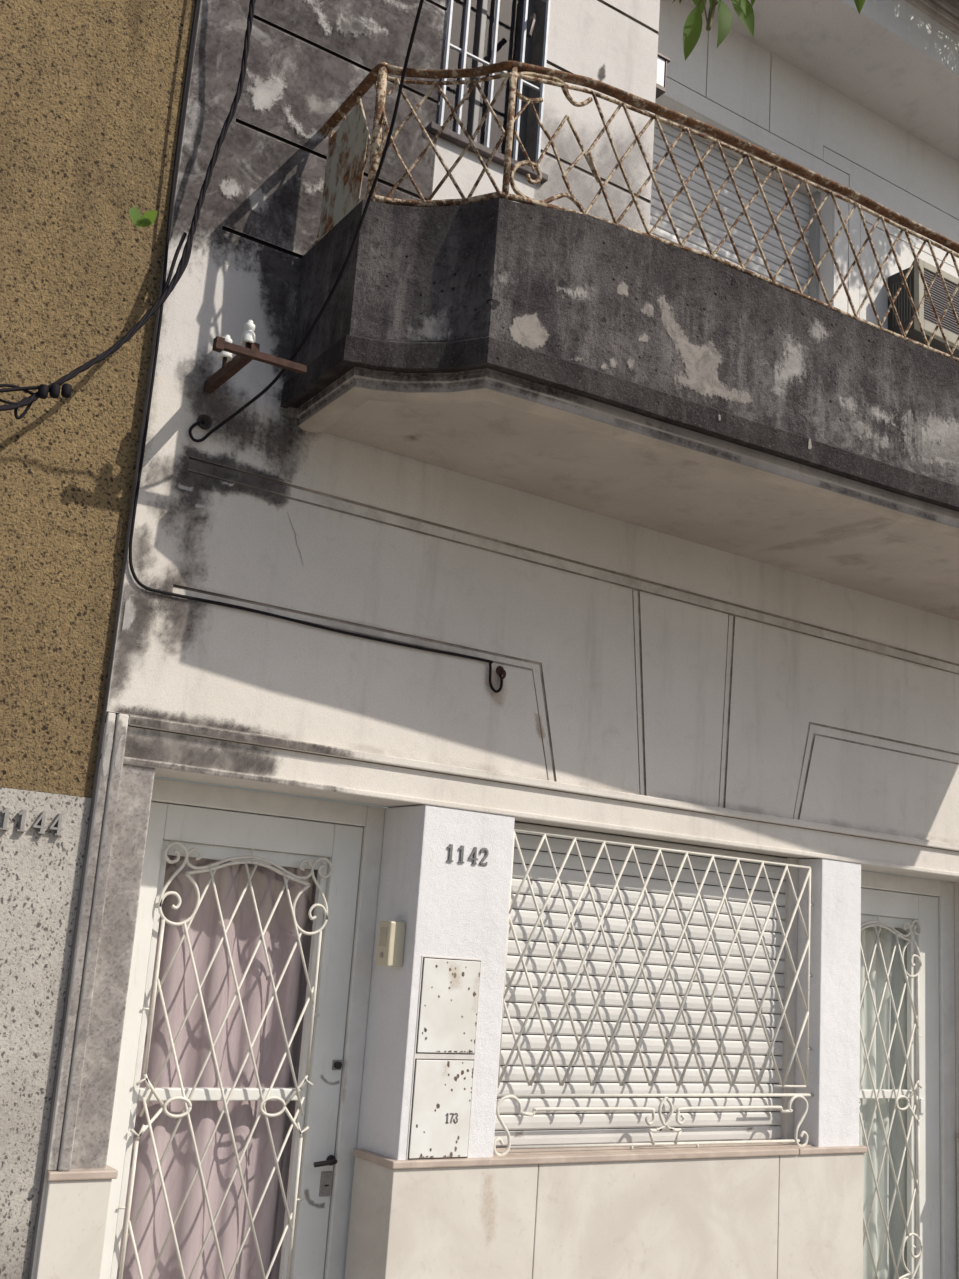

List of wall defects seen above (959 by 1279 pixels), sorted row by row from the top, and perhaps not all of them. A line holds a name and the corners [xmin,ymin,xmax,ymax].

leakage [148,0,581,549]
spalling [617,282,629,296]
spalling [509,313,549,349]
spalling [601,357,635,370]
spalling [641,295,753,404]
spalling [839,396,959,467]
leakage [136,530,150,572]
leakage [51,568,353,1171]